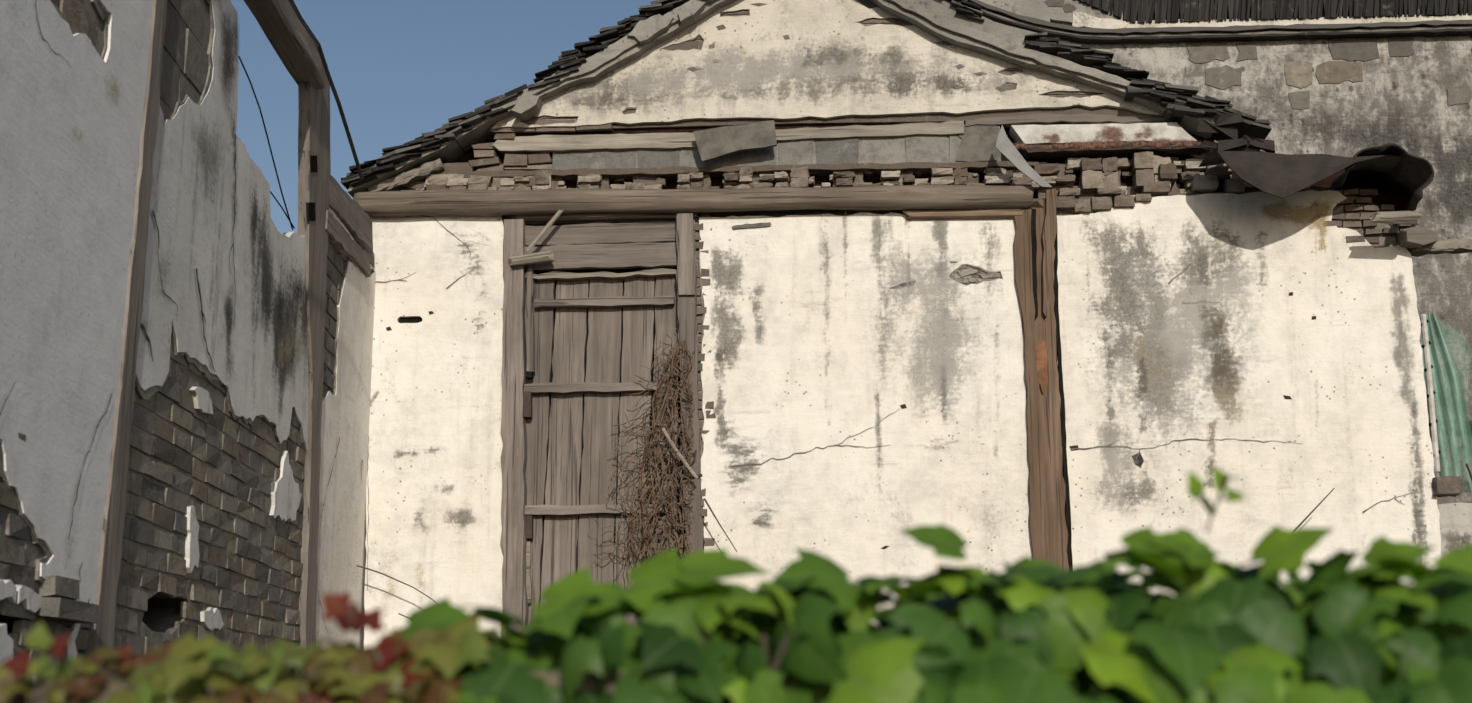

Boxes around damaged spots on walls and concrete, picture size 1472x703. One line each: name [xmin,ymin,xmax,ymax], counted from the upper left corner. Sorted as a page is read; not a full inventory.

spalling [50,0,109,60]
spalling [160,0,215,124]
water stain [549,46,1007,105]
water stain [1288,114,1472,222]
spalling [0,441,91,679]
spalling [113,321,307,659]
water stain [234,187,309,408]
water stain [712,250,762,447]
crack [730,412,895,467]
water stain [873,218,968,417]
spalling [938,261,1003,286]
water stain [1093,228,1265,505]